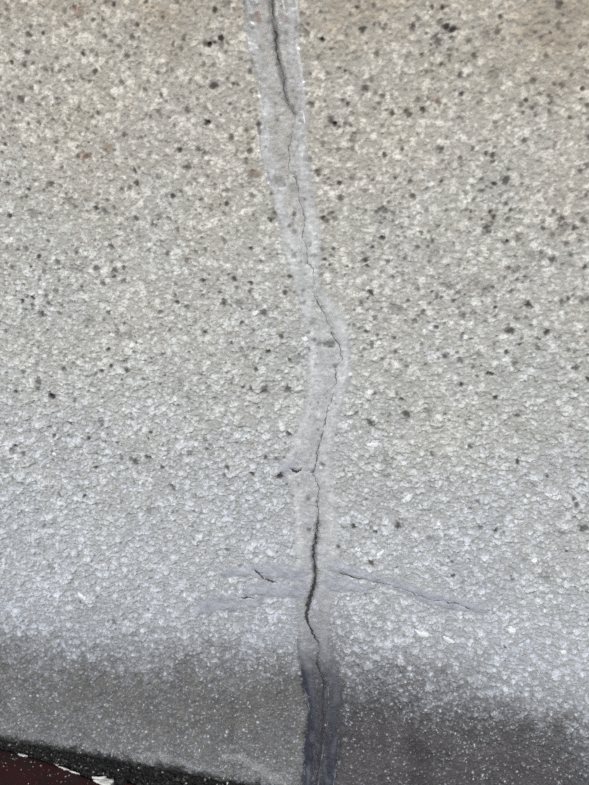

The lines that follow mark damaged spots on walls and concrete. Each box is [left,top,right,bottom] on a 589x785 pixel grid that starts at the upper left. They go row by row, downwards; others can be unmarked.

crack [271,2,343,785]
crack [340,573,471,610]